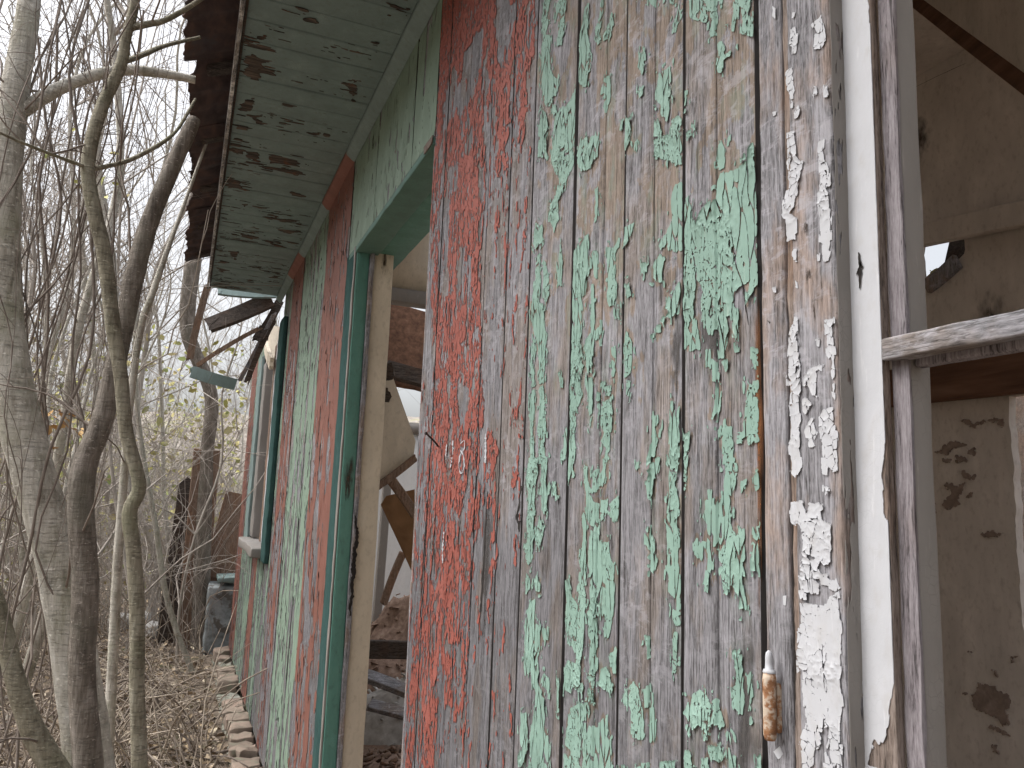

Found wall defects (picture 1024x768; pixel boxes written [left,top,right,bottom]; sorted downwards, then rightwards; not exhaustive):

peeling [211,0,783,768]
peeling [781,0,894,768]
peeling [934,440,976,513]
crack [349,515,359,616]
peeling [962,669,1011,755]